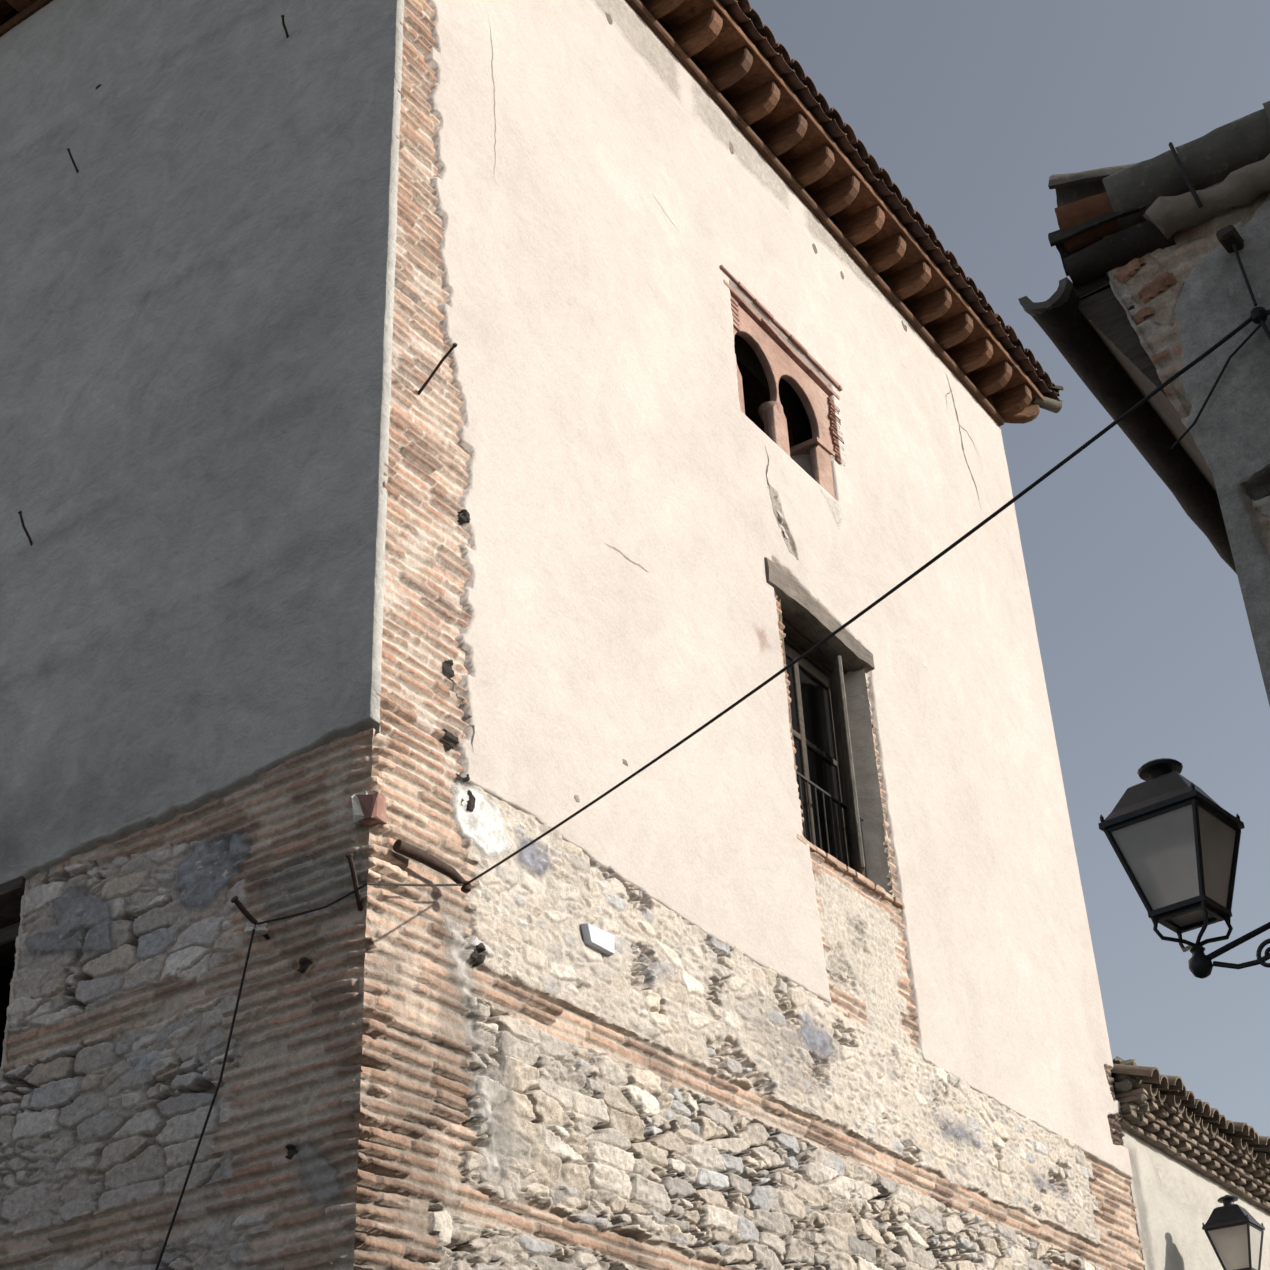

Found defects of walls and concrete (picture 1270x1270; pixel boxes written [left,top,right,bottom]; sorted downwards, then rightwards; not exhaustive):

peeling [597,0,678,95]
peeling [696,91,786,203]
peeling [808,213,880,294]
flaking render [1112,253,1185,327]
crack [946,377,981,506]
spalling [457,509,471,525]
peeling [765,447,799,560]
spalling [442,660,455,678]
spalling [440,729,459,752]